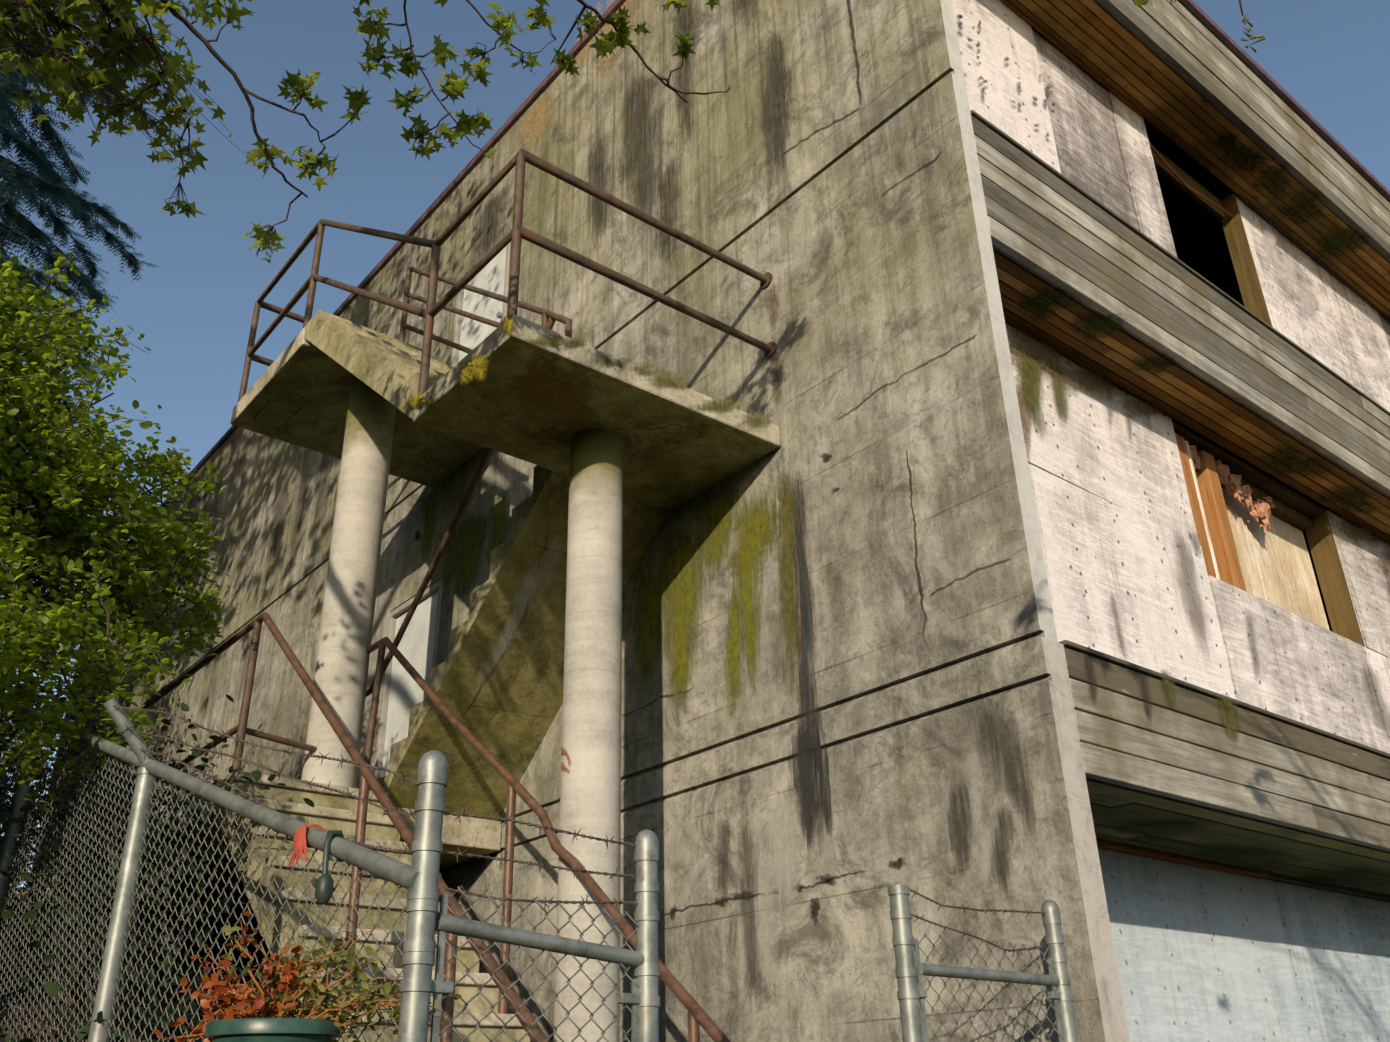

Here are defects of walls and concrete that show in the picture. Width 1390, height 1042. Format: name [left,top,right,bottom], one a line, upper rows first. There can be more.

crack [782,0,862,154]
water stain [634,489,740,710]
crack [906,450,1012,647]
water stain [743,484,832,976]
water stain [950,710,1032,886]